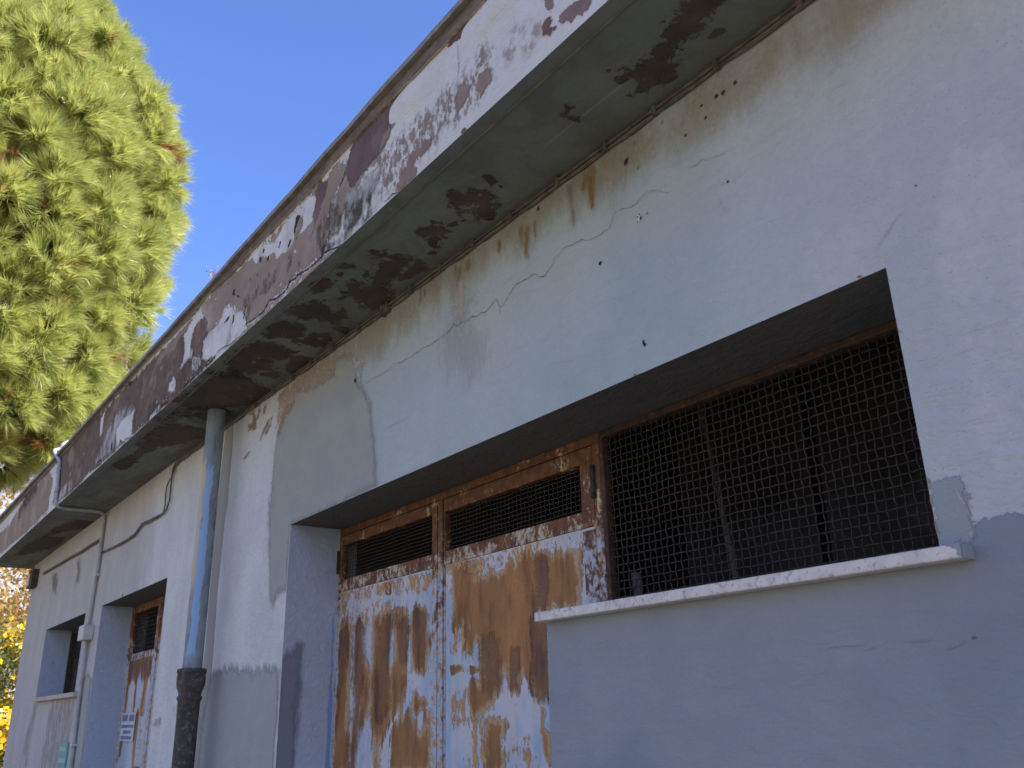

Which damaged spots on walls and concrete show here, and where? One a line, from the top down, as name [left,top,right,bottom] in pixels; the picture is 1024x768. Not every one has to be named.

peeling [447,21,468,47]
peeling [542,0,591,36]
peeling [606,0,725,98]
peeling [0,46,503,556]
corrosion [118,657,153,768]
corrosion [333,573,432,768]
corrosion [446,542,584,768]